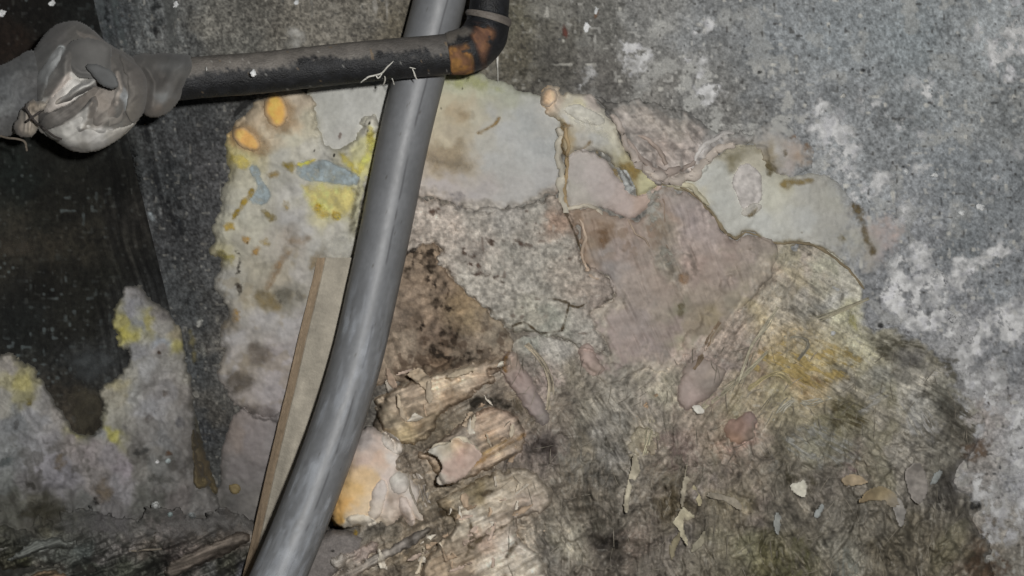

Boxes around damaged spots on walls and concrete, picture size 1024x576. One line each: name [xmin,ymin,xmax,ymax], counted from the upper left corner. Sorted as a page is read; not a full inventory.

rust [449,27,494,75]
peeling [595,96,752,194]
leakage [225,189,254,230]
leakage [304,185,354,220]
leakage [405,248,452,312]
flaking render [407,194,614,353]
leakage [429,327,458,361]
leakage [880,241,1024,544]
peeling [428,436,482,485]
peeling [623,454,641,513]
peeling [669,465,742,560]
peeling [790,480,807,497]